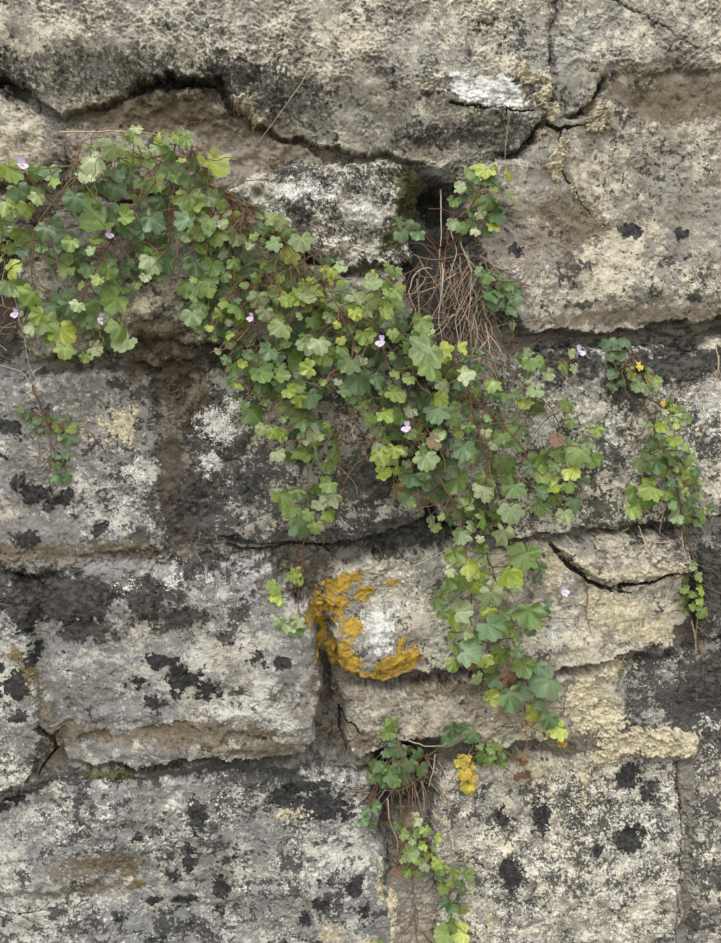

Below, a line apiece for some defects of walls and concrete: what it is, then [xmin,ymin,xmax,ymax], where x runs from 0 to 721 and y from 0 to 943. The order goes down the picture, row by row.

crack [611,0,699,49]
crack [548,542,684,594]
crack [35,726,60,776]